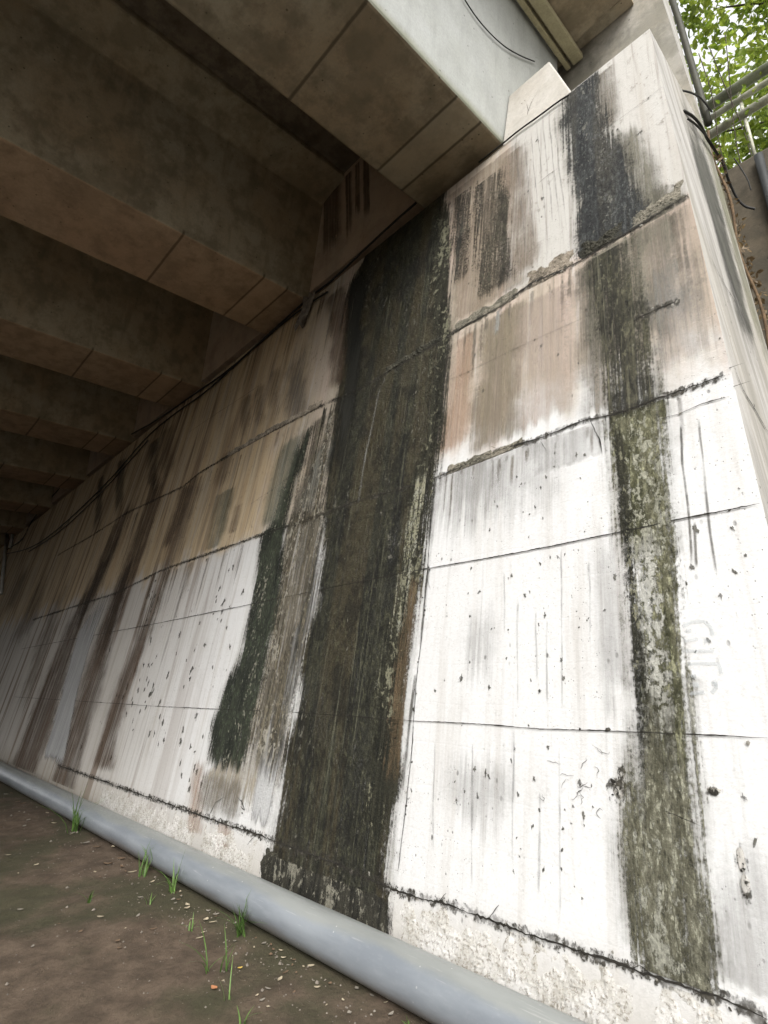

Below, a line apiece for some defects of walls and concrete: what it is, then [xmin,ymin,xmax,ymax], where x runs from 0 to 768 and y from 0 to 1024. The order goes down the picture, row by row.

leakage [14,437,171,786]
leakage [203,150,528,930]
crack [58,195,689,556]
crack [23,371,767,1024]
leakage [559,66,721,991]